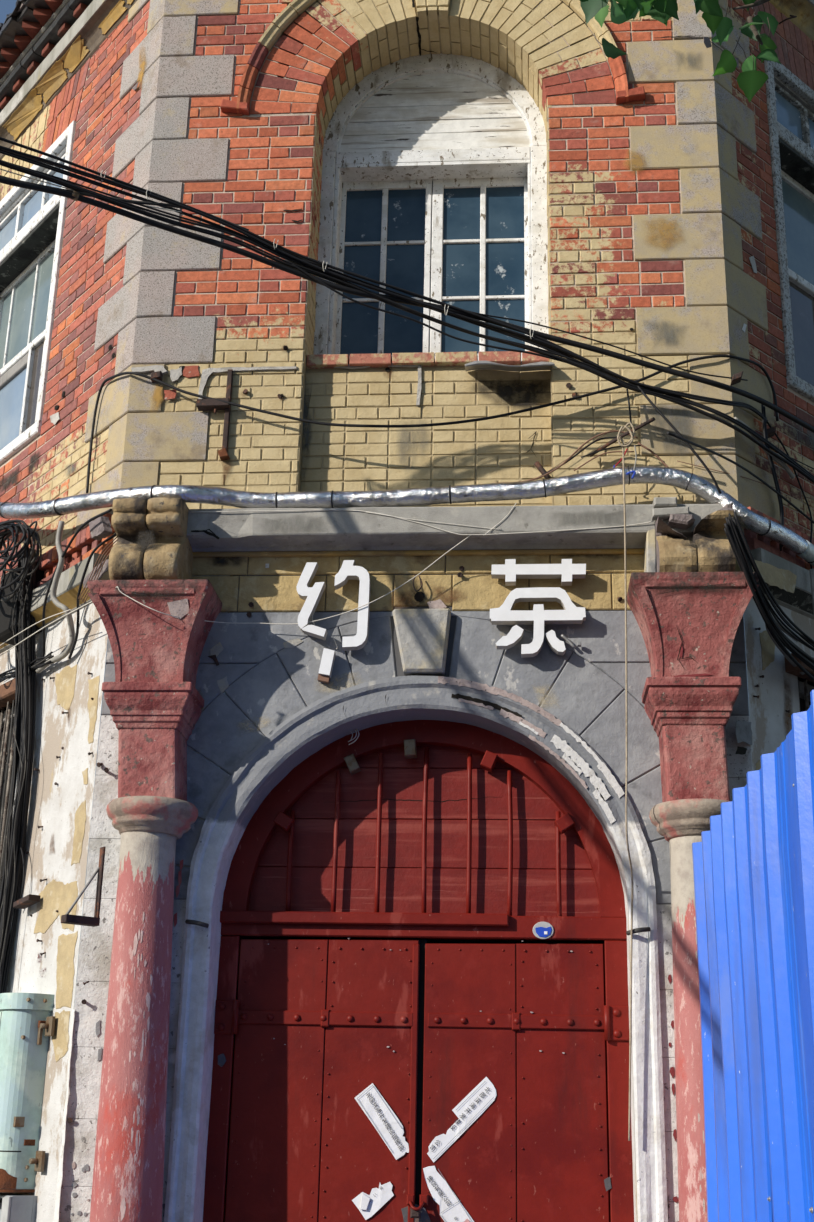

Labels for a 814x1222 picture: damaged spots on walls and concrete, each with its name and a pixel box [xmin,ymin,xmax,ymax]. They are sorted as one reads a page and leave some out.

crack [412,0,436,56]
peeling [167,599,189,619]
peeling [55,664,100,744]
peeling [438,676,625,824]
peeling [71,800,86,866]
peeling [132,913,158,984]
peeling [34,879,94,1222]
peeling [131,1081,144,1166]
rust [0,1169,17,1189]